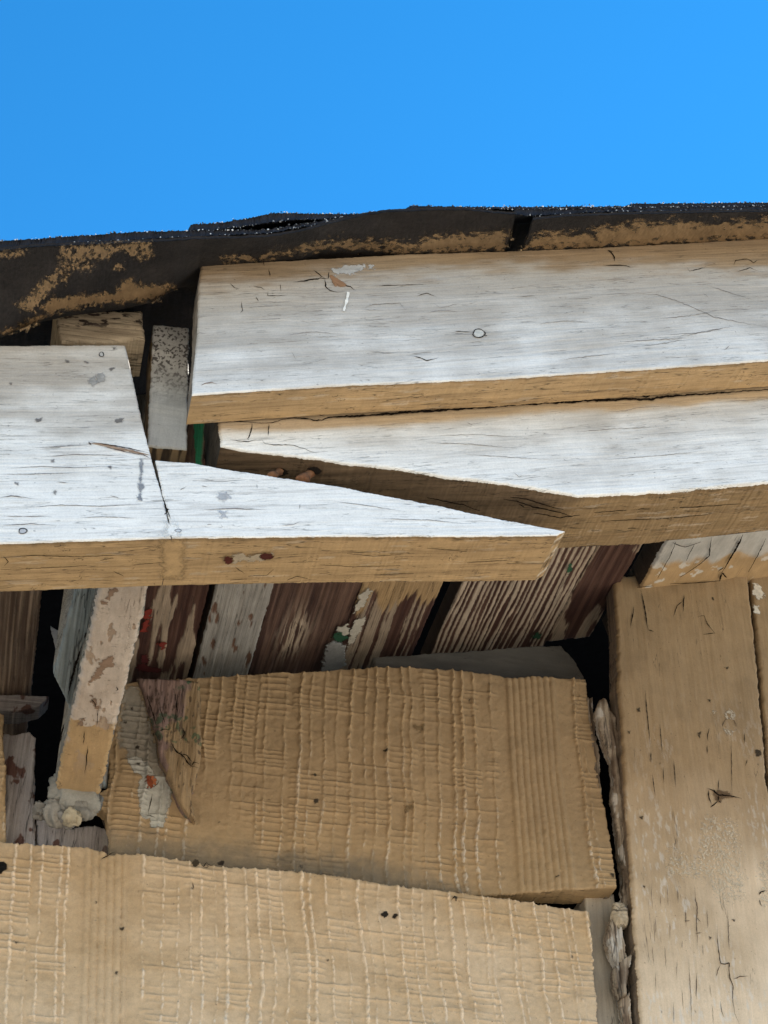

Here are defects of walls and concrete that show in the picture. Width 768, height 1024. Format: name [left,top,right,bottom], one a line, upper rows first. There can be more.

peeling [88,656,114,709]
peeling [128,655,202,825]